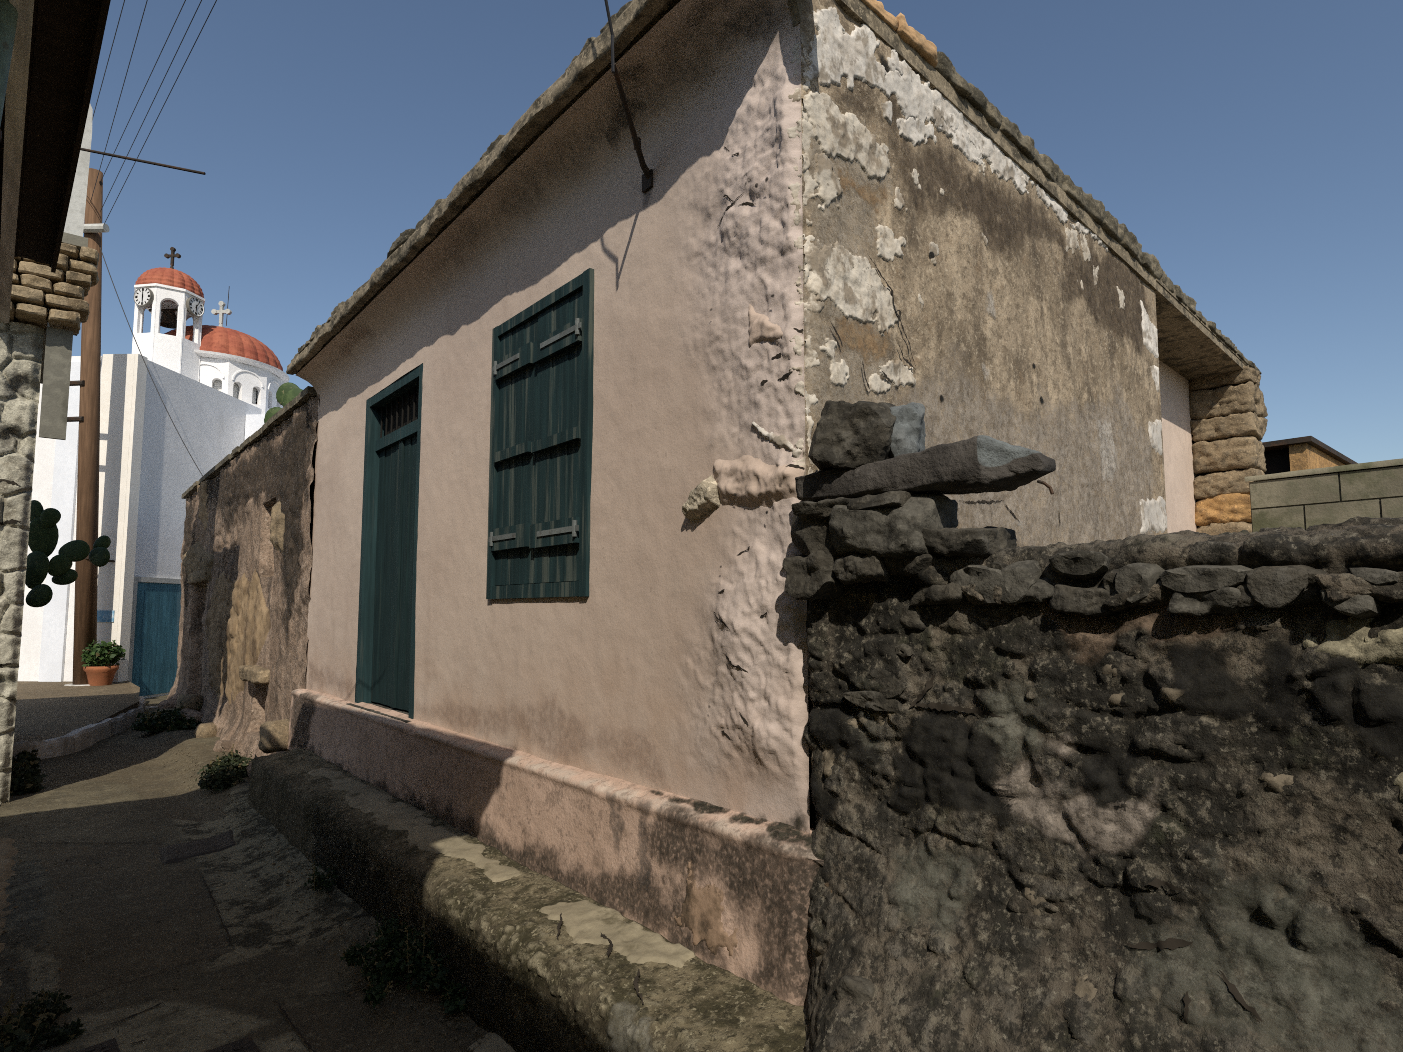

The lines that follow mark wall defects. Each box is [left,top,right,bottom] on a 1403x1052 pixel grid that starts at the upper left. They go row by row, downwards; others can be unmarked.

peeling [752,7,1108,475]
water stain [812,139,1147,351]
water stain [806,303,887,410]
peeling [1116,286,1160,392]
peeling [1148,419,1162,455]
peeling [1140,496,1167,534]
water stain [290,694,321,757]
water stain [367,777,824,1006]